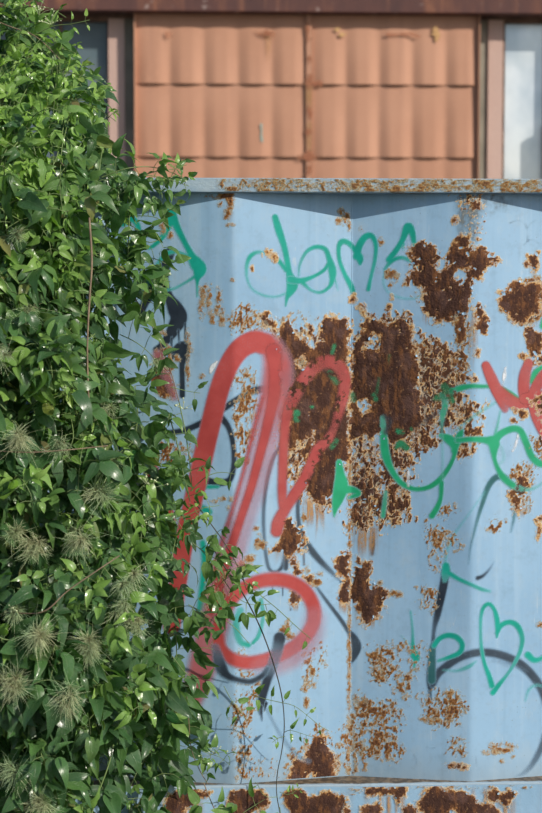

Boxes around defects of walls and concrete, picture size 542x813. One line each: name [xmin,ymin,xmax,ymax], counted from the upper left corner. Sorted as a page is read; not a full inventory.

rust [206,74,542,230]
rust [496,250,542,370]
rust [159,441,191,463]
rust [198,215,533,813]
rust [506,430,542,541]
rust [510,394,542,423]
rust [163,789,214,813]